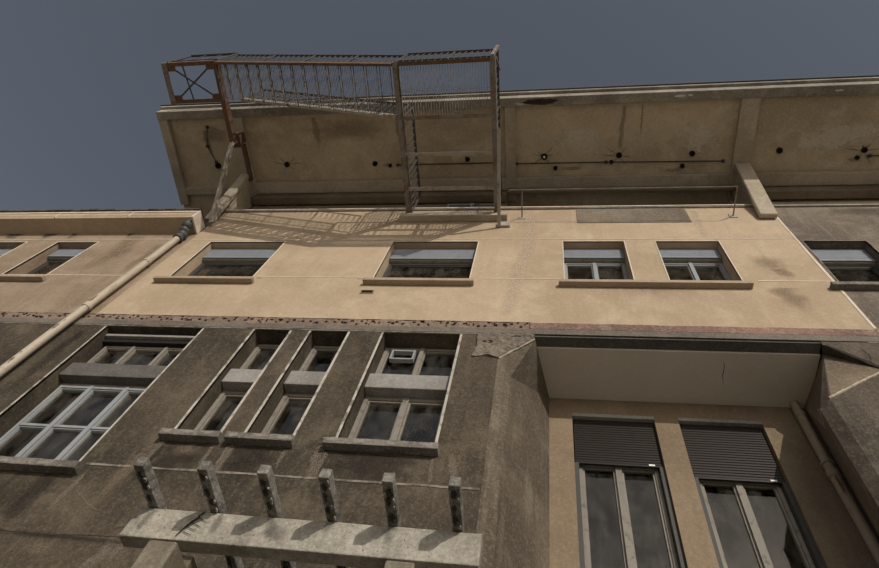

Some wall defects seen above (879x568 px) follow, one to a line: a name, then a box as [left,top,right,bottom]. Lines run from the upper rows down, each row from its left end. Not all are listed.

crack [175,511,206,536]